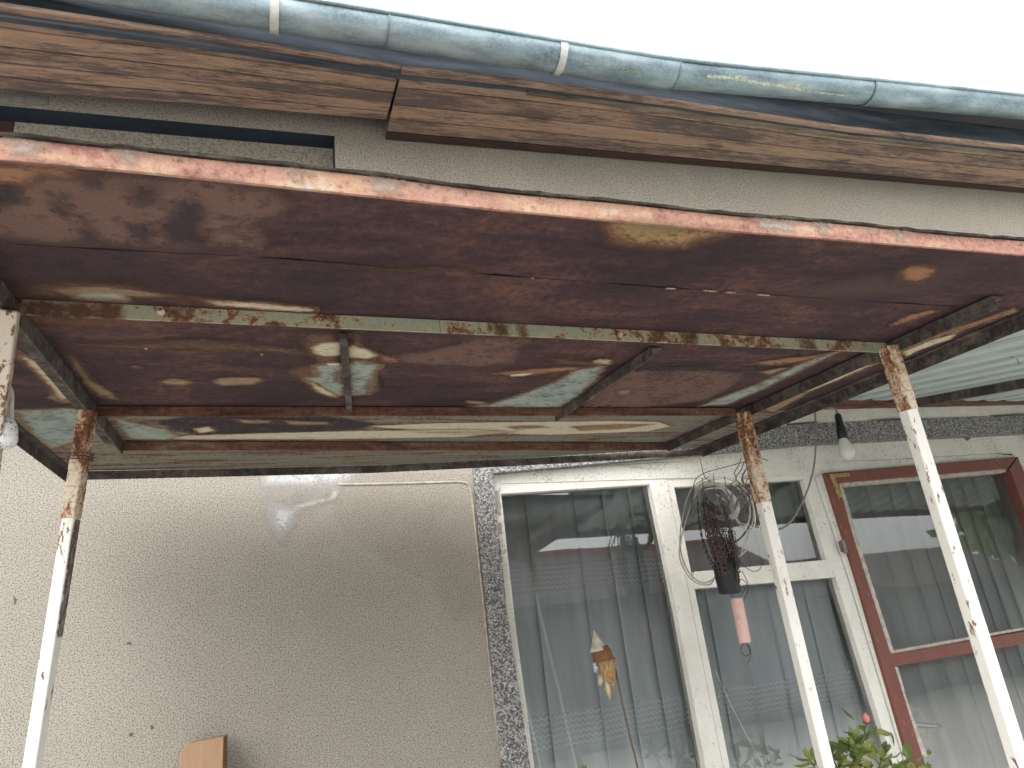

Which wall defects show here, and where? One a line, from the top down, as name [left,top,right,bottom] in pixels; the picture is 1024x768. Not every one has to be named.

rust [0,163,296,250]
rust [605,221,731,248]
rust [21,301,122,324]
rust [71,338,308,356]
peeling [284,332,382,398]
rust [378,322,531,367]
peeling [466,359,612,408]
peeling [112,417,672,440]